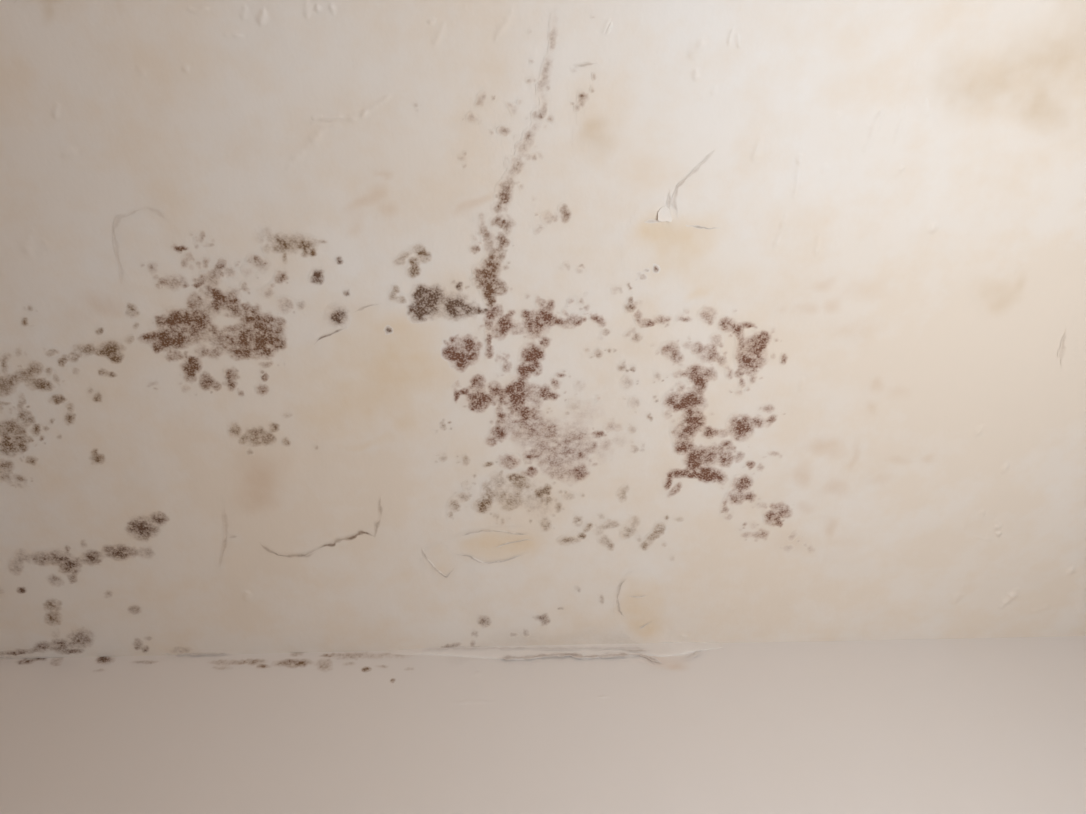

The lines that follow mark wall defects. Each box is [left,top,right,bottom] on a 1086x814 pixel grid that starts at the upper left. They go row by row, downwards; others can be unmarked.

crack [644,150,721,230]
leakage [0,226,345,489]
leakage [323,288,352,330]
leakage [388,9,940,566]
leakage [222,412,298,521]
crack [219,495,383,567]
leakage [0,510,171,673]
leakage [129,636,194,665]